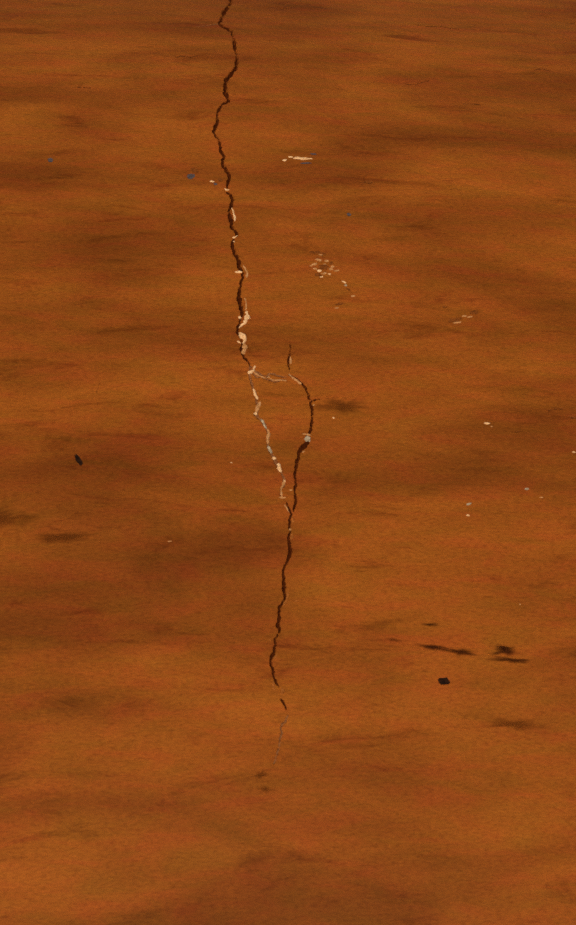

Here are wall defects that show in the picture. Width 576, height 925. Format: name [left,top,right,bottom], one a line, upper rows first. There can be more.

crack [197,0,317,763]